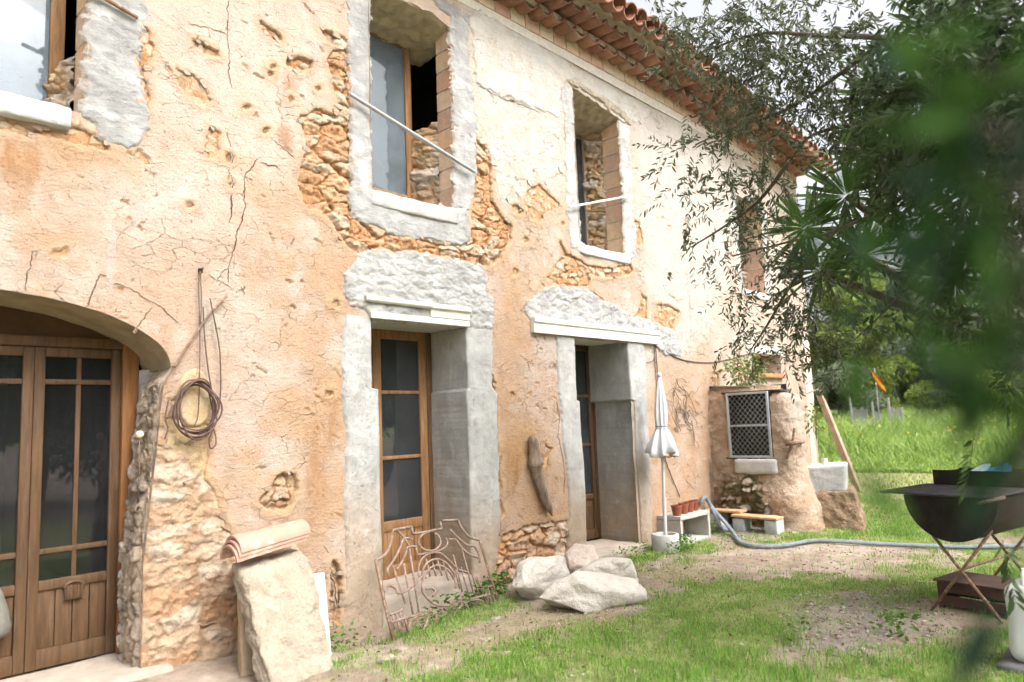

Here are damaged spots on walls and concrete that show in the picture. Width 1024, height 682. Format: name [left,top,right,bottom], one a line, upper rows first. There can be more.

spalling [176,69,209,104]
crack [188,0,233,88]
hole [268,55,310,77]
spalling [298,25,564,266]
crack [208,128,305,295]
crack [24,249,39,290]
spalling [547,242,638,288]
crack [85,273,179,333]
spalling [630,296,681,330]
spalling [259,472,295,510]
spalling [140,418,238,668]
spalling [493,481,568,586]